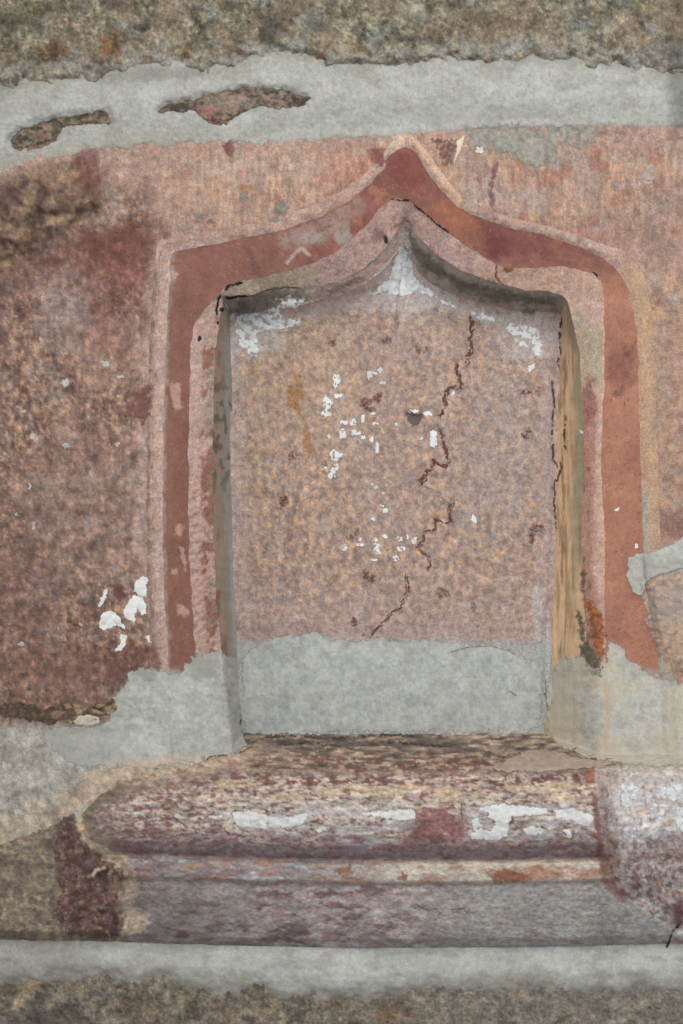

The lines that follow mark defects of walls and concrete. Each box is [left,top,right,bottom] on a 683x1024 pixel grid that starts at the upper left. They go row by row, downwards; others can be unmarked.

spalling [158,87,311,122]
spalling [11,110,110,148]
crack [362,313,475,638]
peeling [98,576,148,651]
rust [584,598,607,657]
spalling [0,698,117,725]
peeling [470,803,594,841]